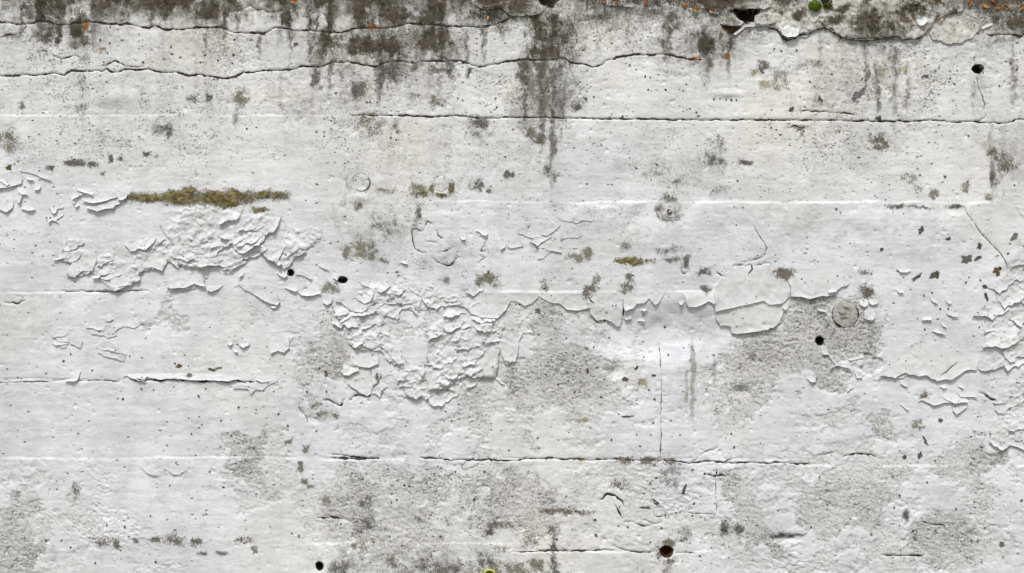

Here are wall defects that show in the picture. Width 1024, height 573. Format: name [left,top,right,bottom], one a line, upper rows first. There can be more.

leakage [3,0,248,52]
crack [0,5,695,79]
leakage [586,0,757,68]
crack [769,26,921,42]
leakage [822,0,957,95]
leakage [266,0,588,182]
crack [351,79,1022,133]
peeling [46,187,128,223]
peeling [52,198,665,406]
peeling [679,265,849,334]
peeling [879,254,1024,450]
crack [421,344,876,515]